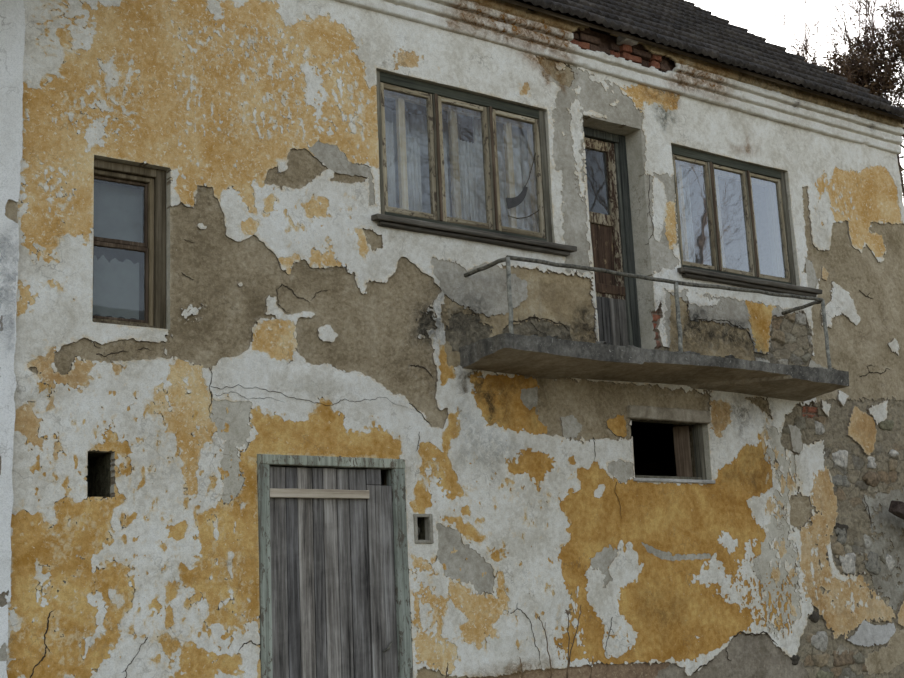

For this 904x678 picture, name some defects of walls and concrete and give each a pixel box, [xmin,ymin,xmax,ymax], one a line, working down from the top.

flaking render [570,28,676,73]
crack [88,339,151,357]
peeling [0,0,596,678]
peeling [409,165,904,678]
crack [30,611,53,678]